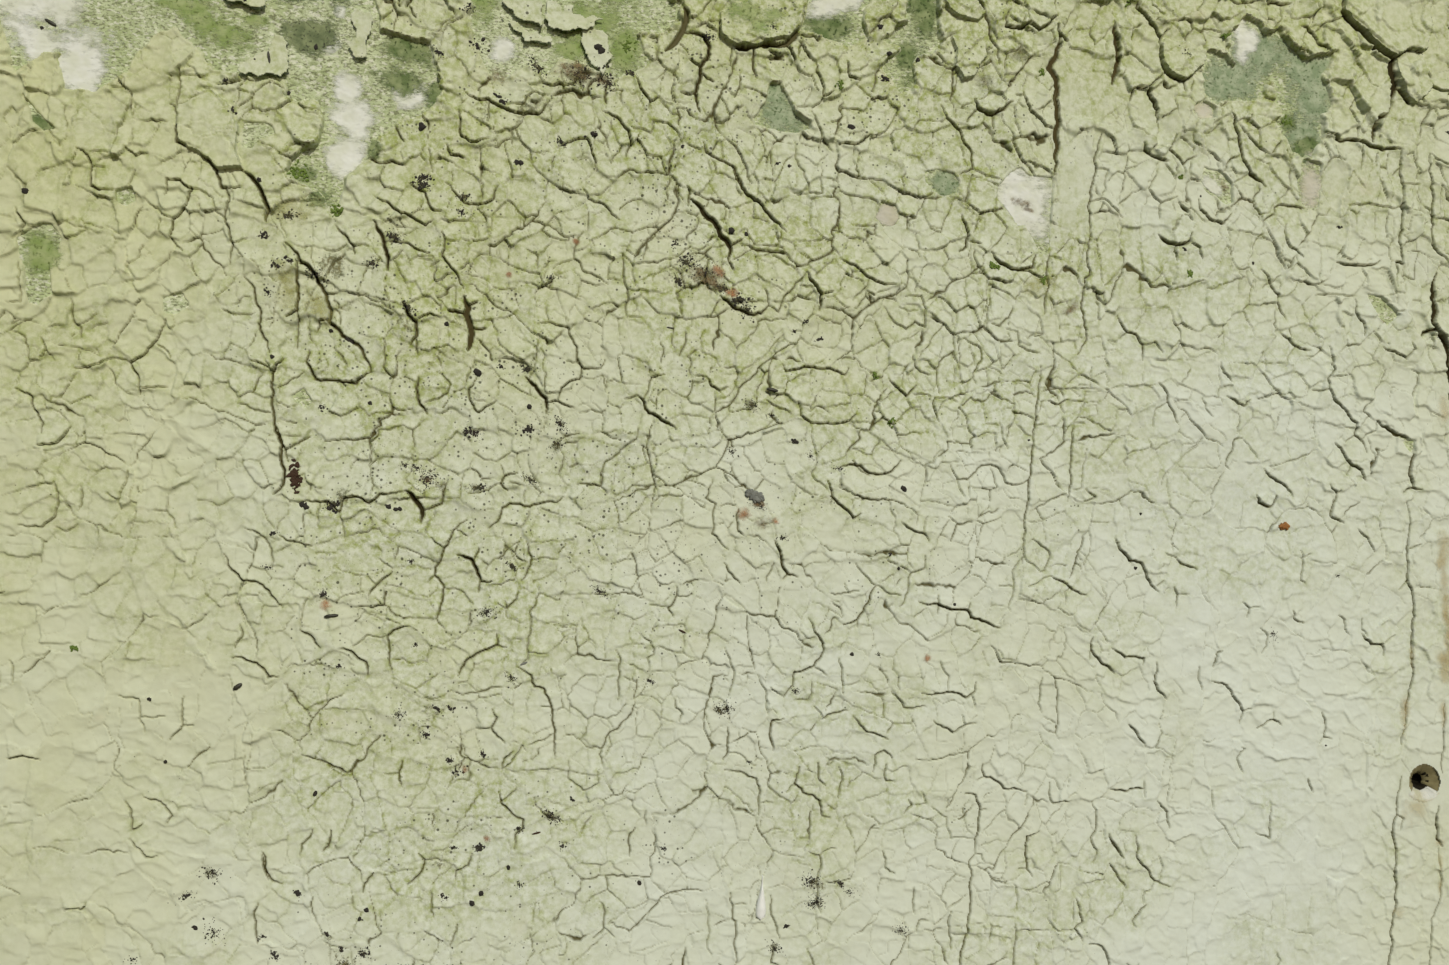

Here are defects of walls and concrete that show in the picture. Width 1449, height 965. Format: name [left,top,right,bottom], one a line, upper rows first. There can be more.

peeling [0,0,439,214]
leakage [276,0,357,59]
leakage [324,70,377,180]
leakage [392,84,428,131]
leakage [469,37,638,107]
peeling [470,0,681,79]
peeling [720,0,871,47]
peeling [882,0,987,92]
crack [1046,44,1059,158]
crack [696,205,731,256]
crack [463,298,474,350]
crack [1422,276,1449,395]